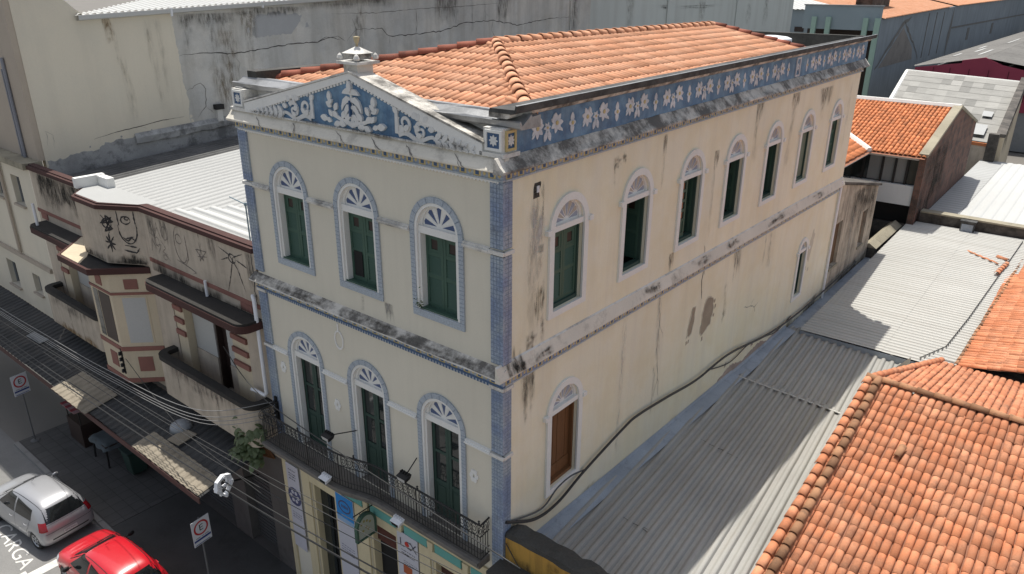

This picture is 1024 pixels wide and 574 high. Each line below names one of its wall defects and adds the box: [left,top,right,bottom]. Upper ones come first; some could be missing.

crack [180,3,567,66]
crack [102,83,212,137]
peeling [685,296,716,345]